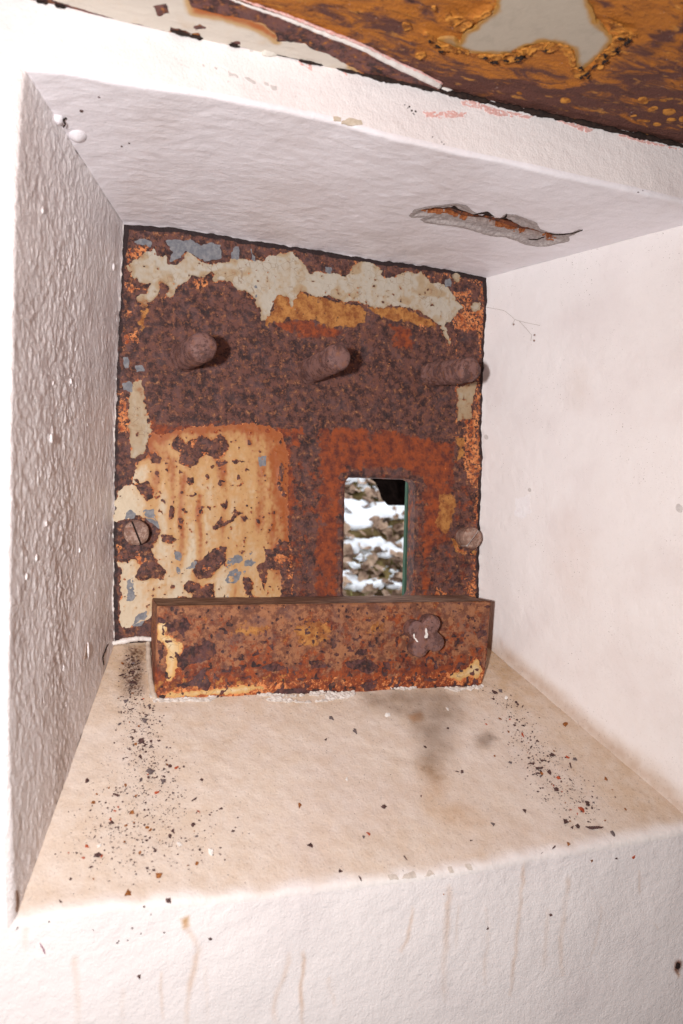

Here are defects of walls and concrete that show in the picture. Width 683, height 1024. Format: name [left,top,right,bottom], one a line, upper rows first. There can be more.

peeling [415,0,637,79]
rust [630,97,683,126]
spalling [409,204,583,247]
rust [156,603,488,698]